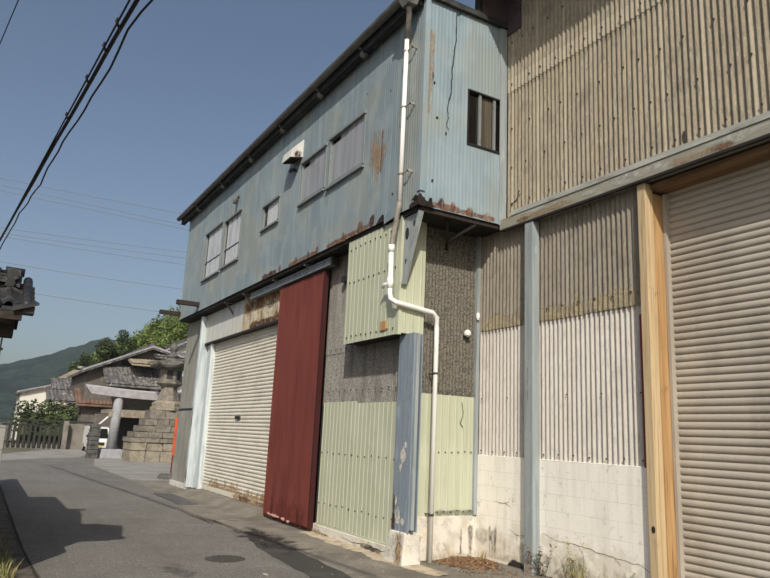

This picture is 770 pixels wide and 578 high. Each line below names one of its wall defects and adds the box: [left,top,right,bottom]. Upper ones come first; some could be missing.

crack [446,11,461,129]
corrosion [432,198,494,221]
corrosion [243,290,280,328]
crack [543,533,649,572]